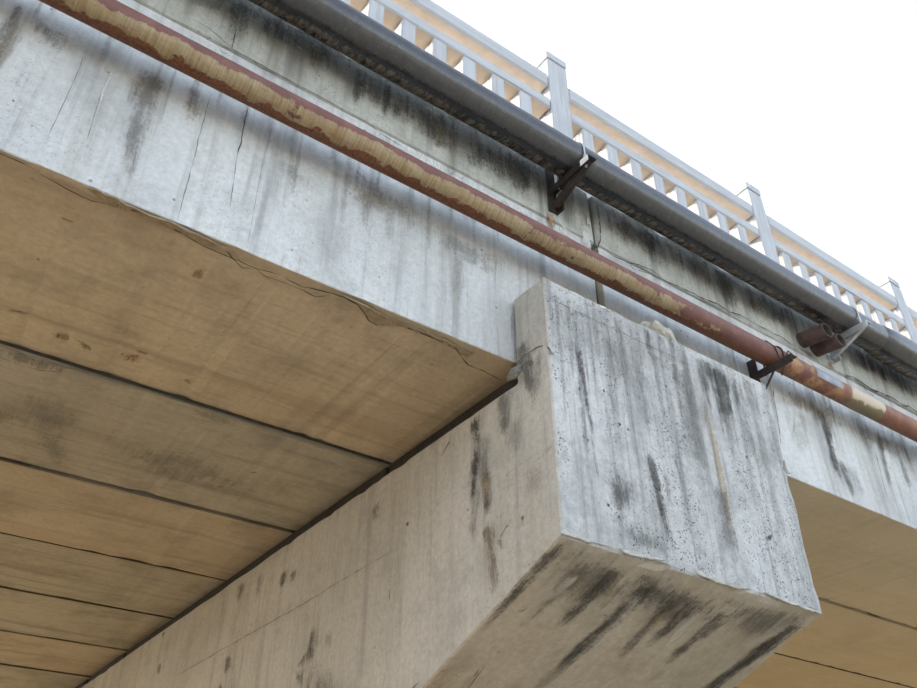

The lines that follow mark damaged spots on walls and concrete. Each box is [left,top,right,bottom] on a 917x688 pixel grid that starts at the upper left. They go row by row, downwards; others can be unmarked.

spalling [0,153,499,380]
crack [567,205,794,346]
damp [572,351,593,430]
damp [703,361,732,420]
crack [840,372,917,417]
damp [470,418,489,508]
damp [648,456,670,540]
damp [793,397,854,493]
damp [489,545,562,622]
damp [562,570,619,625]
damp [559,582,728,669]
damp [710,624,801,688]